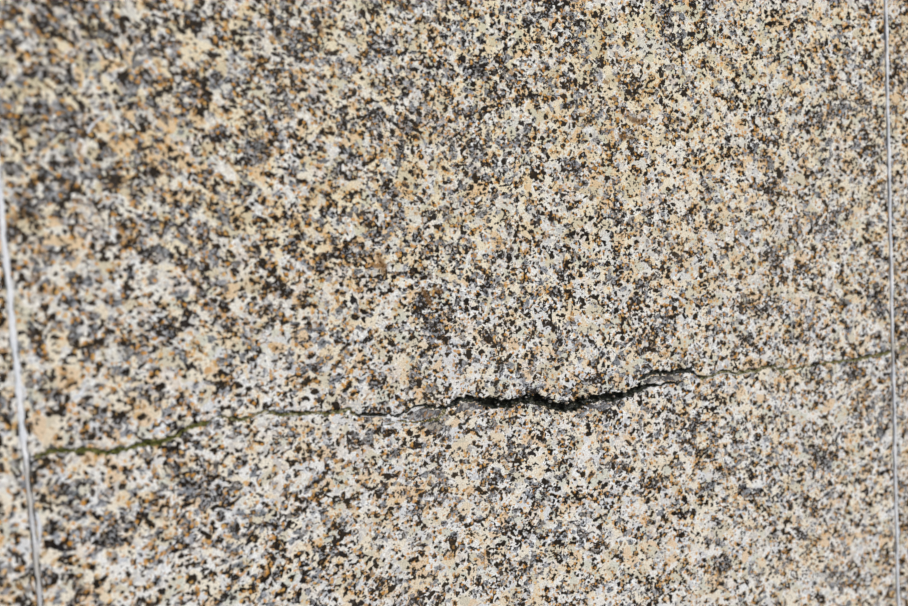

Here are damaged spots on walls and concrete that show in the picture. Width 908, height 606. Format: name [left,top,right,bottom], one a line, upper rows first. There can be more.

crack [35,344,907,459]